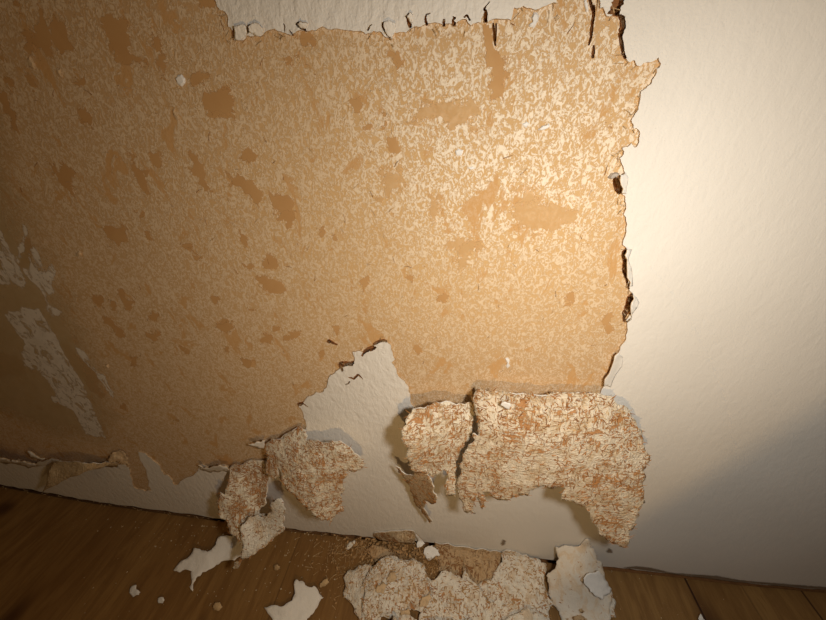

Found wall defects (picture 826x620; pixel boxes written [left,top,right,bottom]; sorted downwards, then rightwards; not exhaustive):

peeling [0,0,659,569]
crack [607,0,627,59]